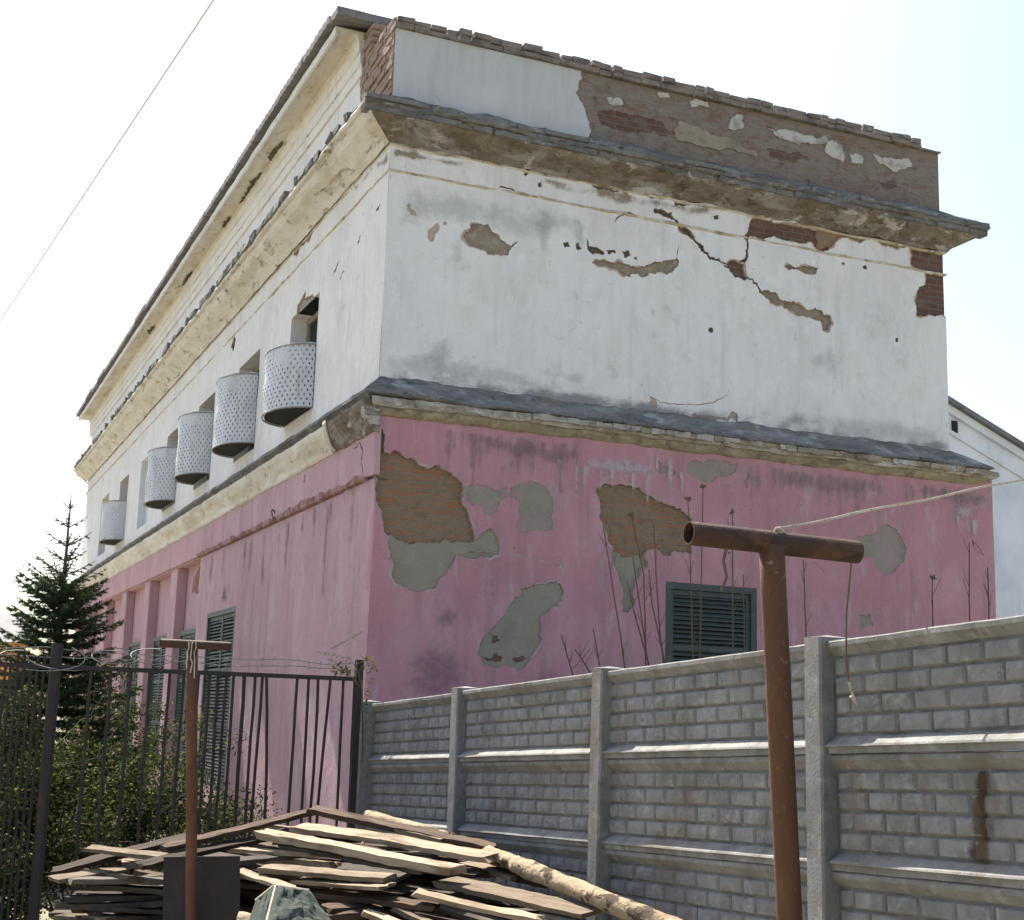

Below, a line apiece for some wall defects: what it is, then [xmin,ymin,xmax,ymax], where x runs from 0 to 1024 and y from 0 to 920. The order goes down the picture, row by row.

peeling [673,114,757,157]
peeling [767,128,912,172]
flaking render [461,222,517,256]
flaking render [563,242,678,277]
crack [654,208,755,284]
flaking render [744,217,946,318]
flaking render [760,290,833,333]
flaking render [192,431,554,594]
flaking render [595,481,693,612]
flaking render [857,524,906,576]
flaking render [478,579,564,670]
rust [973,771,988,864]